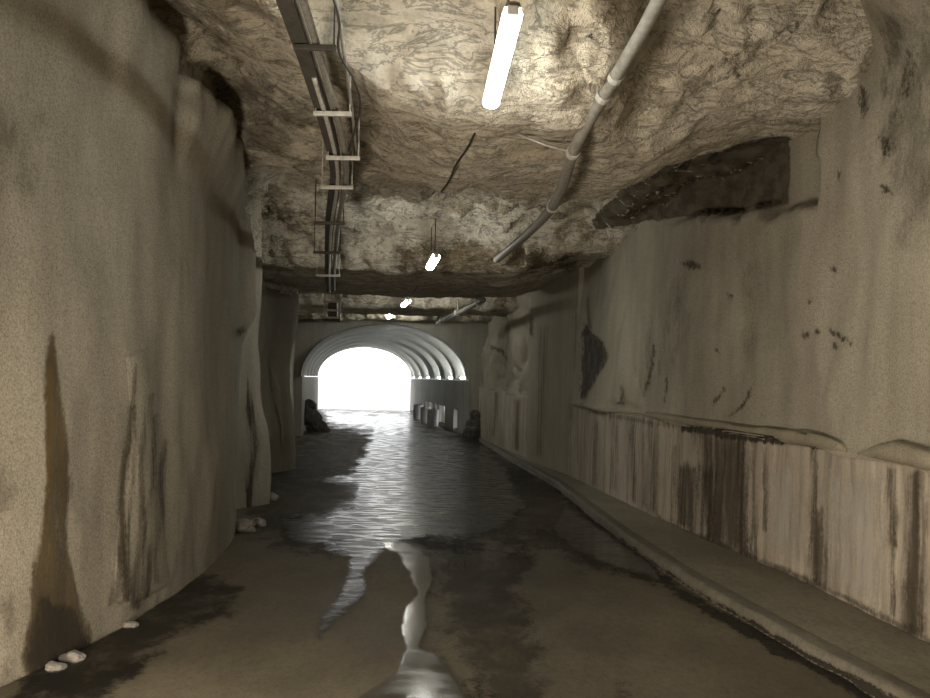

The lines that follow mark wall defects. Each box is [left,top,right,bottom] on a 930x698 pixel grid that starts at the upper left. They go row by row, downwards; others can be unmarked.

leakage [11,335,245,698]
leakage [246,389,372,528]
leakage [456,425,897,698]